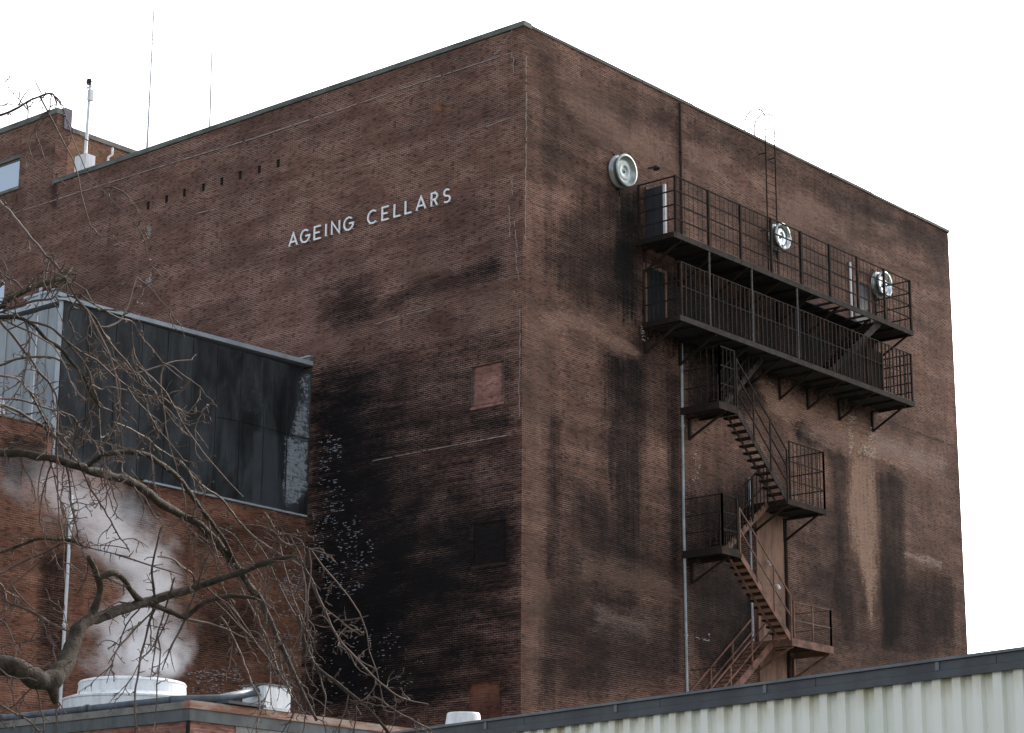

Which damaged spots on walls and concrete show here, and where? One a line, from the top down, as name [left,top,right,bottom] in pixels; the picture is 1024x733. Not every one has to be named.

water stain [542,190,649,340]
peeling [283,374,310,504]
water stain [312,435,374,595]
water stain [603,355,646,583]
water stain [829,415,942,642]